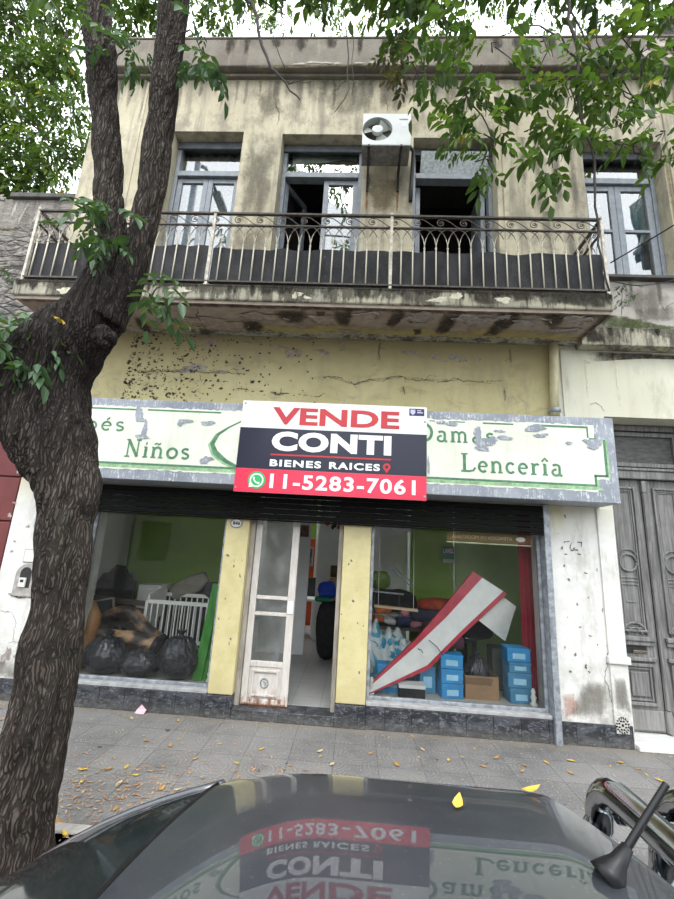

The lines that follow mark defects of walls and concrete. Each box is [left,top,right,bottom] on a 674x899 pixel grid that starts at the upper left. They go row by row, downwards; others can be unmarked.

damp [15,279,75,289]
damp [145,282,674,361]
damp [120,318,282,402]
crack [273,344,510,398]
peeling [135,404,149,439]
peeling [474,426,513,451]
peeling [525,424,548,437]
peeling [565,434,603,450]
damp [582,687,603,713]
damp [617,682,628,704]